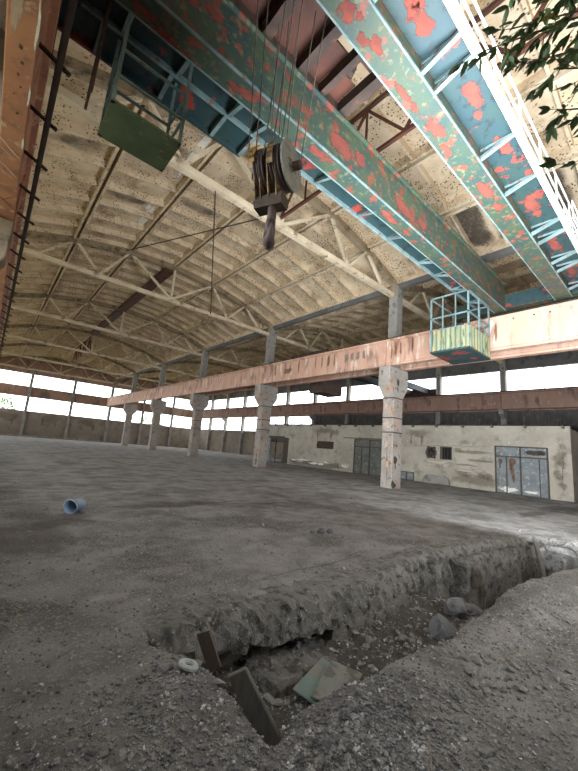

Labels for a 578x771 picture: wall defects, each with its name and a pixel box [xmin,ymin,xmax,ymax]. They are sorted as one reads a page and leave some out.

corrosion [336,0,366,24]
corrosion [404,0,436,37]
corrosion [356,31,383,56]
corrosion [228,81,259,103]
corrosion [395,82,420,114]
corrosion [460,80,485,120]
corrosion [309,132,365,168]
corrosion [424,117,452,157]
corrosion [492,136,514,155]
corrosion [477,182,503,211]
corrosion [380,193,427,236]